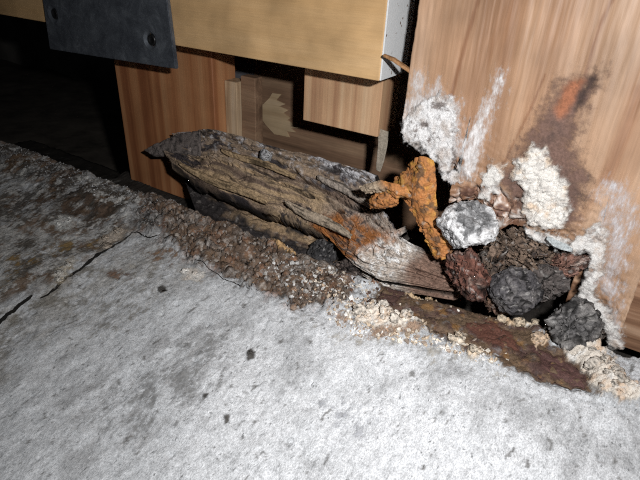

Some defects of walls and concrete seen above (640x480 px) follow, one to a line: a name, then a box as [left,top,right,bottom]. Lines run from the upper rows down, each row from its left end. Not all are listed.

crack [0,231,158,324]
spalling [140,192,353,310]
leakage [401,72,640,402]
peeling [546,236,573,252]
rust [374,282,600,393]